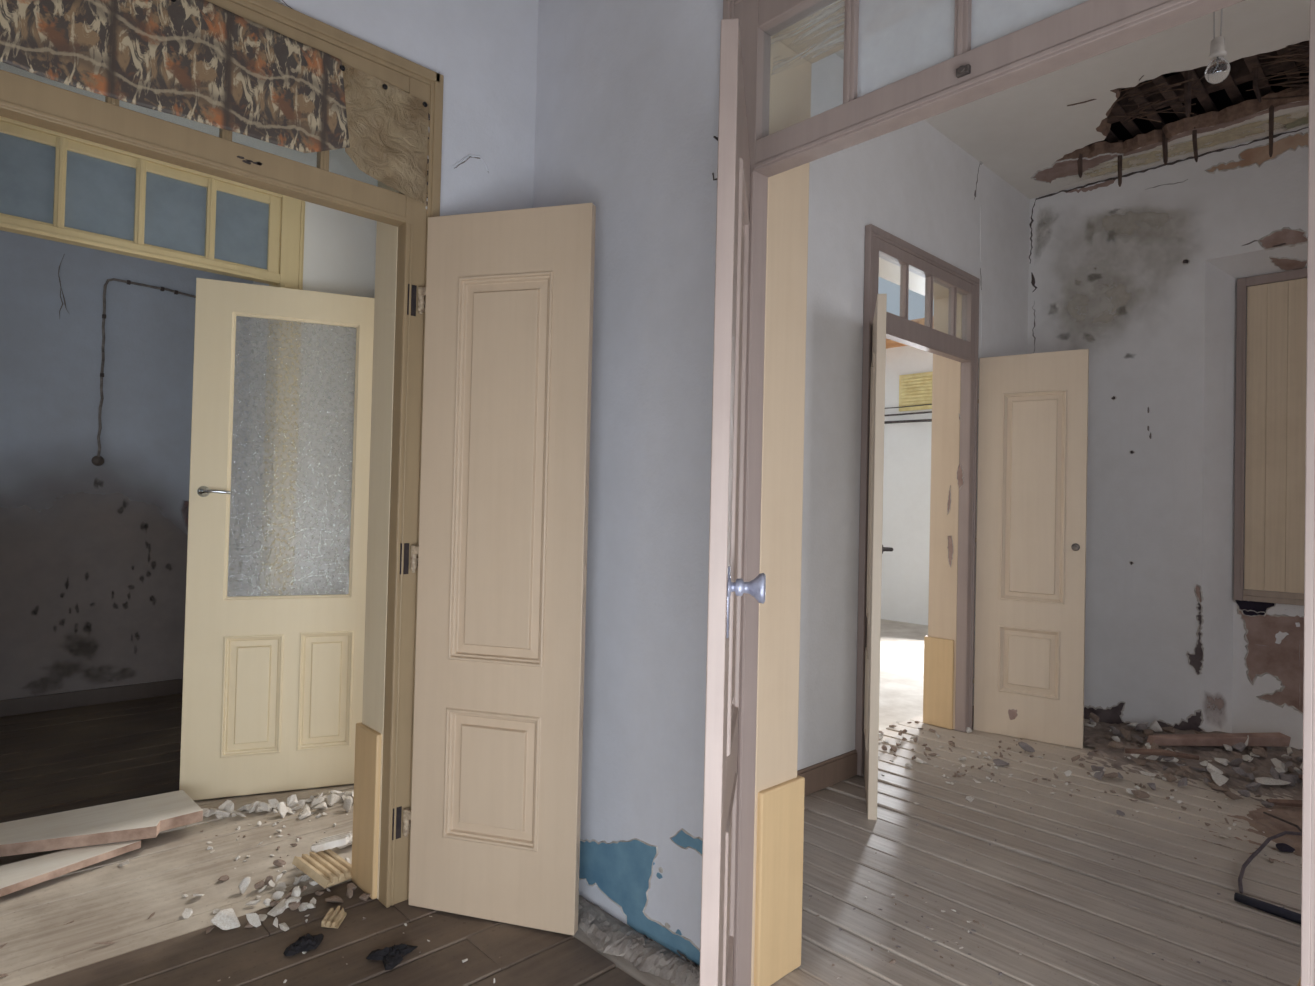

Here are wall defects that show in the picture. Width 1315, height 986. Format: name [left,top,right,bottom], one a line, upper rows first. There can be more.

spalling [1031,66,1309,193]
crack [1029,127,1309,353]
spalling [1242,227,1308,271]
damp [0,478,188,700]
damp [227,536,243,597]
spalling [1084,701,1131,724]
spalling [1157,709,1206,732]
spalling [1186,584,1204,675]
spalling [1233,599,1304,714]
peeling [578,828,703,986]